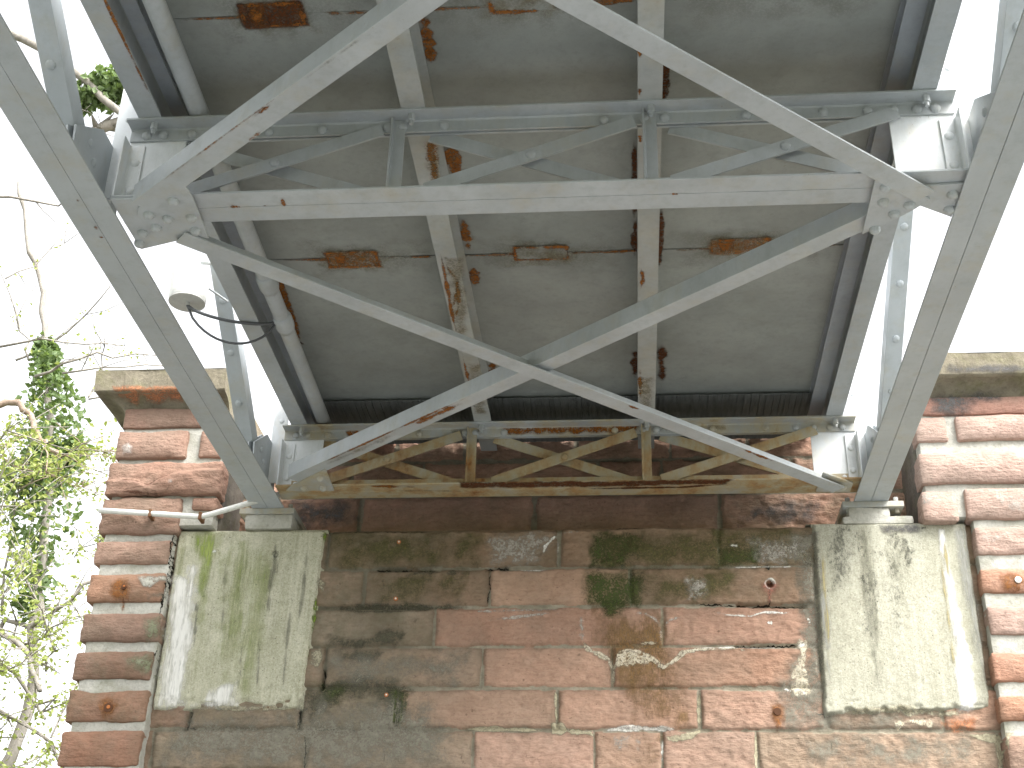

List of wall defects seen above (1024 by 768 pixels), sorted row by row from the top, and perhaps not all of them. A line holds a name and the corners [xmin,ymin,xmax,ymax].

rust [194,1,309,30]
rust [420,0,537,62]
rust [662,65,670,99]
rust [427,143,462,179]
rust [631,136,642,179]
rust [442,209,637,332]
rust [630,348,667,409]
rust [460,479,732,489]
damp [883,524,926,569]
damp [158,566,198,707]
damp [580,572,745,759]
damp [939,529,981,710]